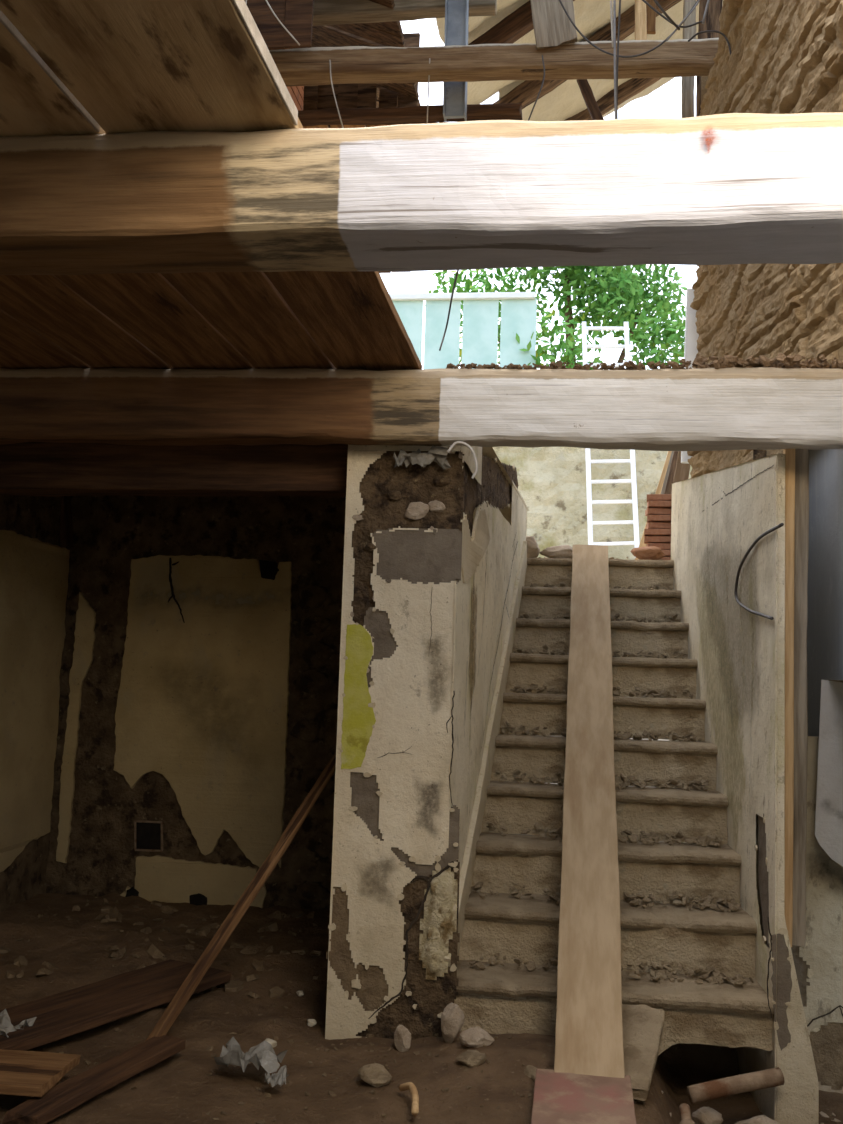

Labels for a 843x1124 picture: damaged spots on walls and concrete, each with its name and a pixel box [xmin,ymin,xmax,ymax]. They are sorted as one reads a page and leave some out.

spalling [326,449,519,1040]
spalling [189,893,207,906]
crack [368,861,454,1019]
spalling [754,813,814,1050]
flaking render [809,1022,843,1090]